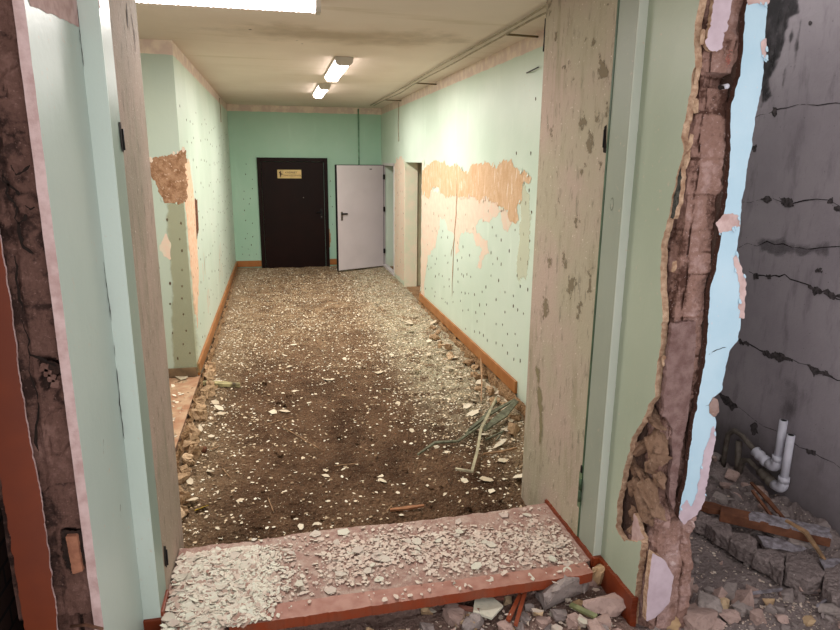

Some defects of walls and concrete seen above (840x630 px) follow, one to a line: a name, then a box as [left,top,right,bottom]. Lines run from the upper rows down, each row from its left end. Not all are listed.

crack [755,102,840,118]
spalling [149,139,217,338]
peeling [420,151,532,299]
crack [739,241,840,300]
crack [747,196,840,212]
crack [713,339,840,381]
spalling [626,407,672,535]
peeling [679,397,719,524]